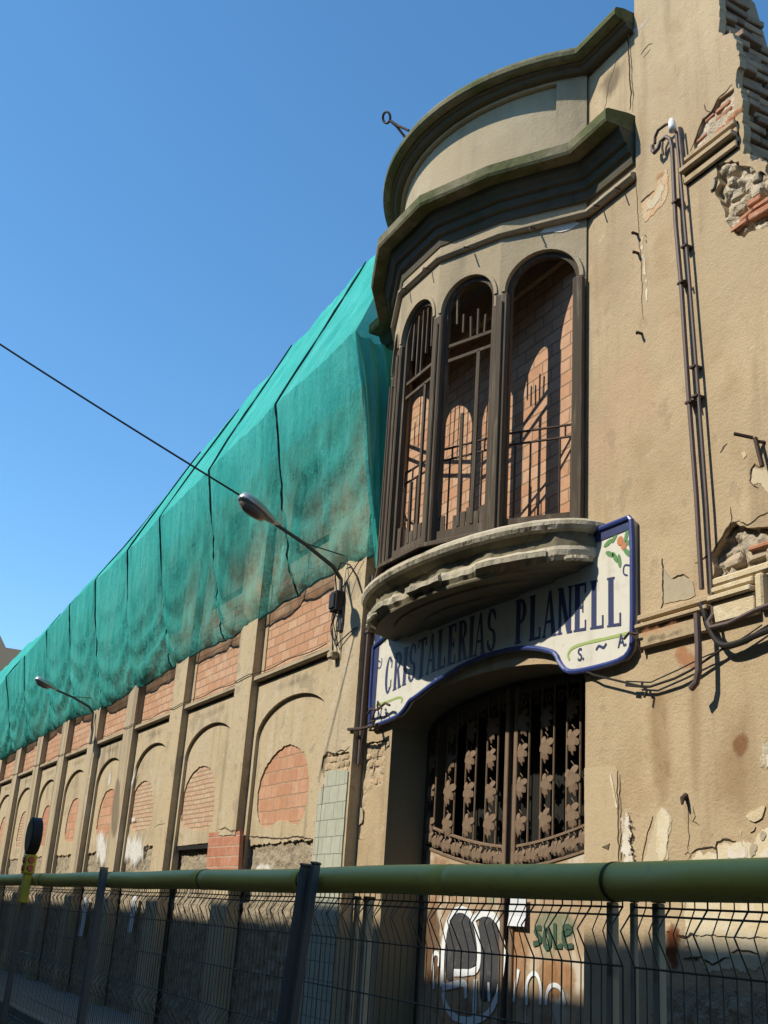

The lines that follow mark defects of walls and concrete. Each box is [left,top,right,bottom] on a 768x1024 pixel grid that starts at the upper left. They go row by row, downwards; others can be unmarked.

crack [604,36,632,109]
flaking render [695,84,742,148]
peeling [642,169,669,222]
flaking render [710,159,768,237]
peeling [741,450,768,494]
flaking render [718,526,768,577]
corrosion [733,735,747,755]
water stain [97,833,107,865]
water stain [124,836,143,865]
peeling [642,807,672,861]
peeling [689,806,768,860]
peeling [684,902,768,974]